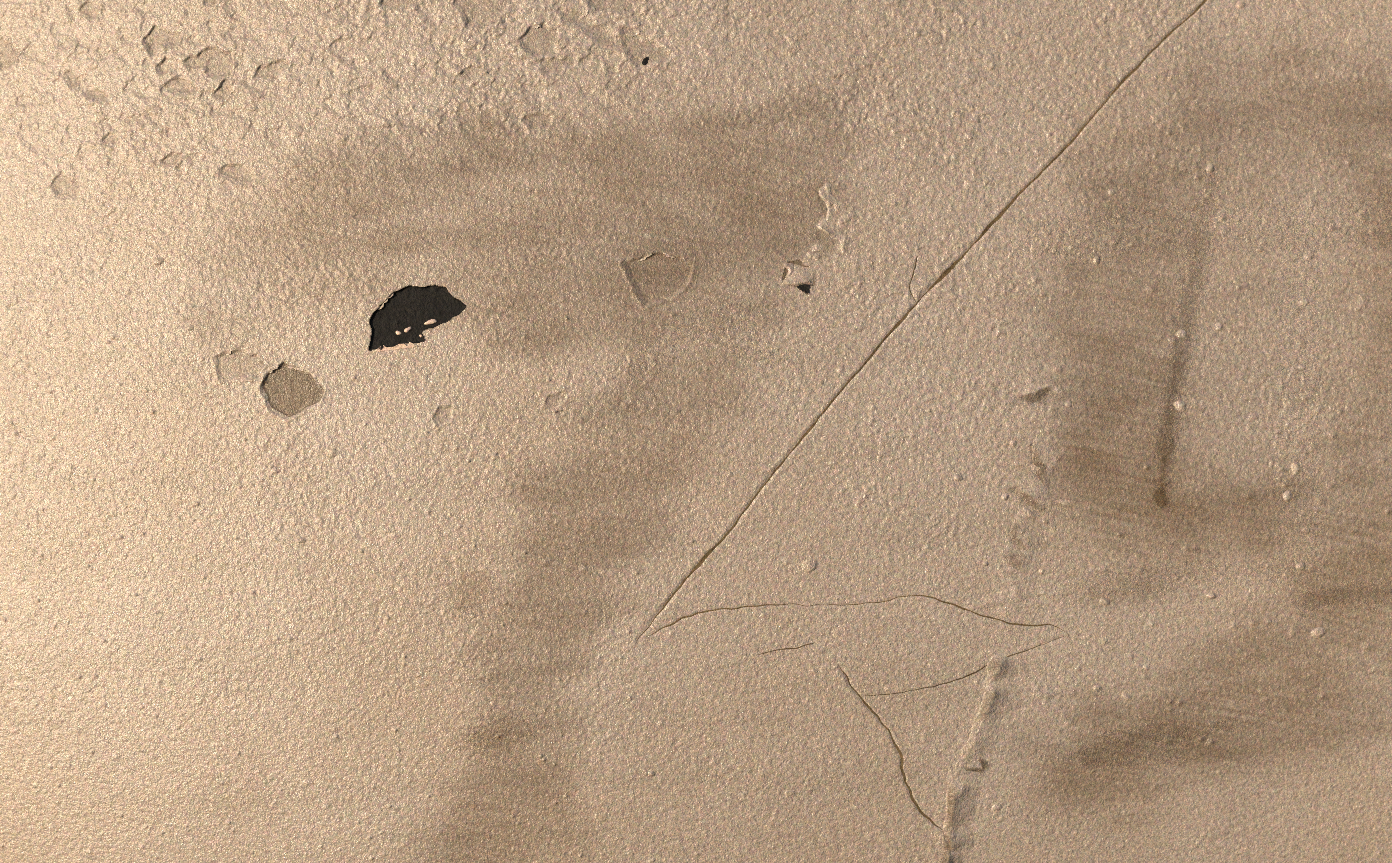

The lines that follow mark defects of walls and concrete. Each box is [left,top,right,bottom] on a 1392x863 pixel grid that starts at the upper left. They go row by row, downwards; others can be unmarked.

spalling [369,284,466,352]
peeling [262,363,324,417]
crack [637,0,1207,829]